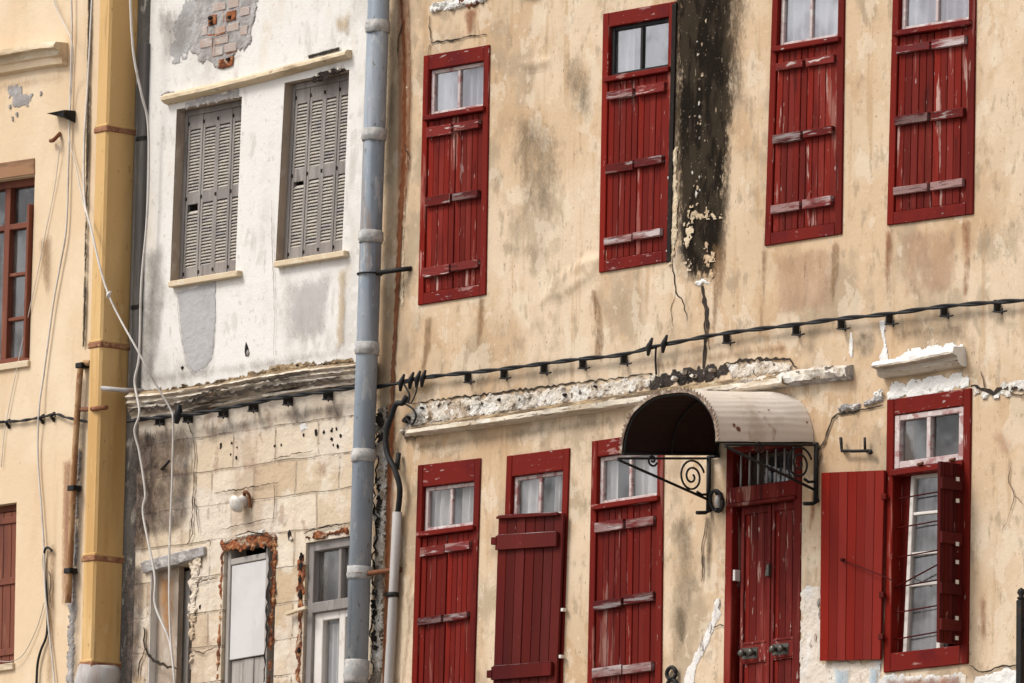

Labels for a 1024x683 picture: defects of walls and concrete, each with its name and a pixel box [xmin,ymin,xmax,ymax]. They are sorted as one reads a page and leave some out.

flaking render [169,0,258,69]
peeling [8,84,42,121]
leakage [666,0,742,323]
crack [670,263,710,368]
flaking render [400,356,797,441]
flaking render [838,389,884,412]
leakage [134,427,189,549]
flaking render [187,557,202,664]
peeling [800,586,1016,683]